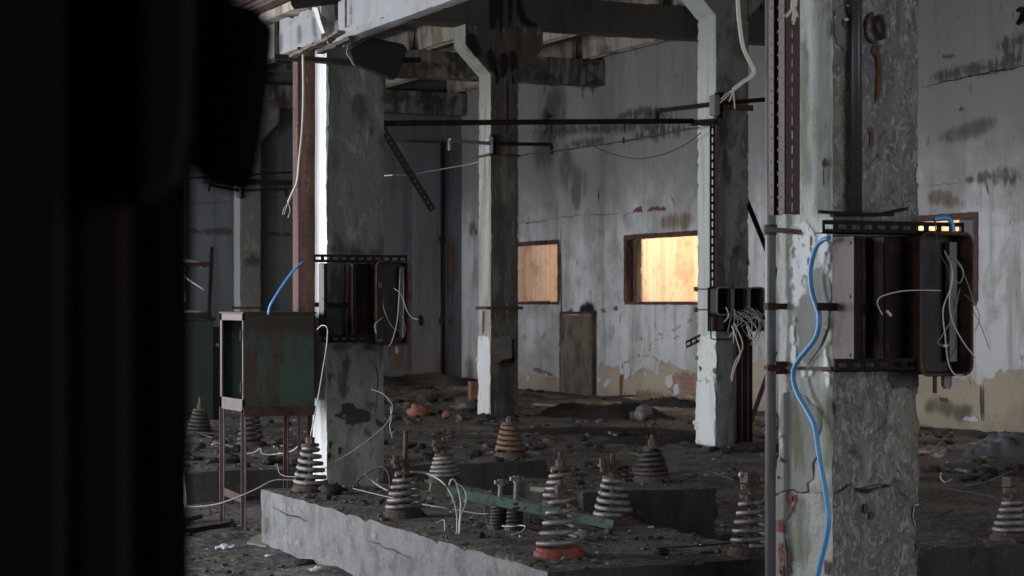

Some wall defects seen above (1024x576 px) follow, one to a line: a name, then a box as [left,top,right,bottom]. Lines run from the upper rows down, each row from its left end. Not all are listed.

water stain [543,108,680,146]
peeling [792,267,831,365]
peeling [334,402,384,428]
peeling [596,334,717,447]
peeling [887,364,1024,433]
crack [776,477,912,501]